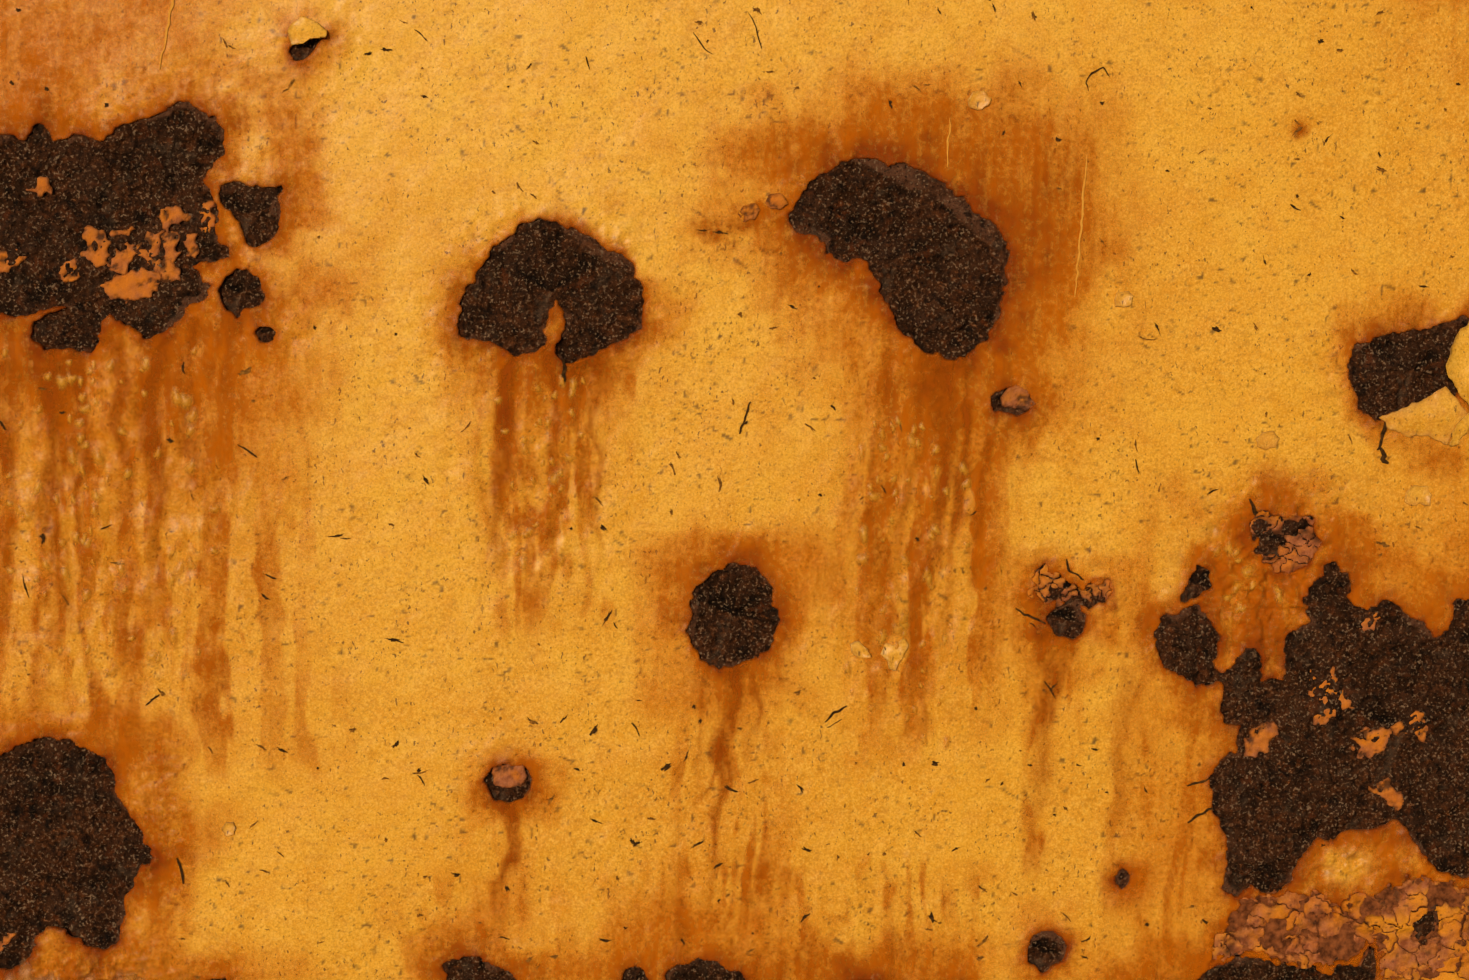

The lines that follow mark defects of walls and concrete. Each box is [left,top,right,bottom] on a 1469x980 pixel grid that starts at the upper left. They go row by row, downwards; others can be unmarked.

peeling [0,101,283,353]
rust [0,0,335,737]
peeling [458,219,644,363]
rust [440,216,663,609]
peeling [738,158,1010,360]
rust [698,82,1113,700]
rust [1341,305,1469,436]
peeling [1347,315,1469,446]
peeling [0,737,154,969]
rust [0,676,242,980]
rust [1011,475,1469,980]
peeling [1154,510,1469,980]